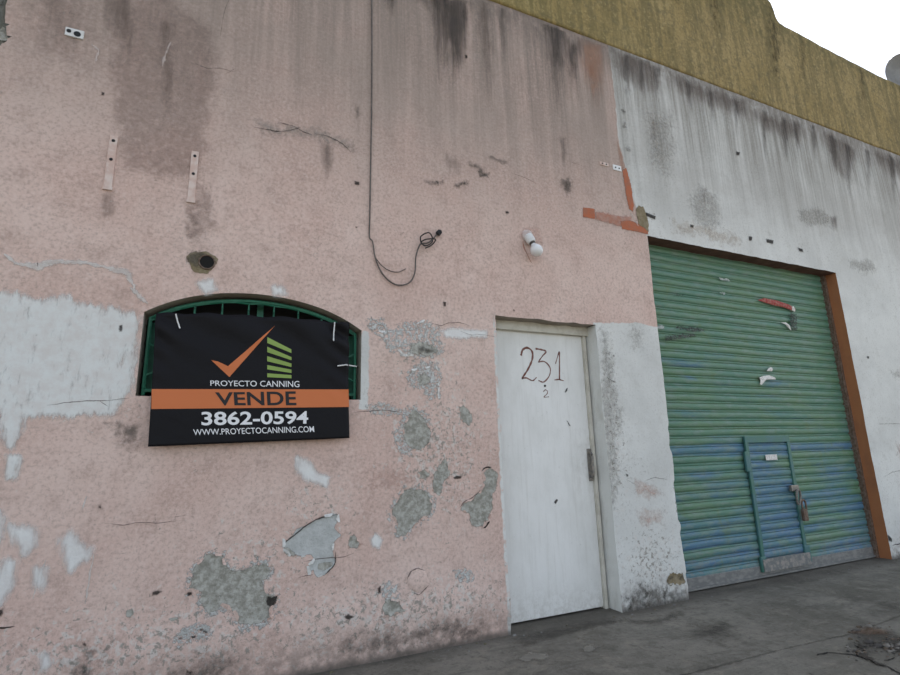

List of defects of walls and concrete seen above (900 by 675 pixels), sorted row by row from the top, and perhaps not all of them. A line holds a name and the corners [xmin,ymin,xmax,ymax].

crack [4,254,148,304]
peeling [366,316,487,400]
spalling [365,402,431,458]
spalling [459,404,473,426]
peeling [295,456,329,488]
spalling [386,459,461,540]
spalling [460,466,498,529]
peeling [282,513,382,578]
spalling [169,550,280,648]